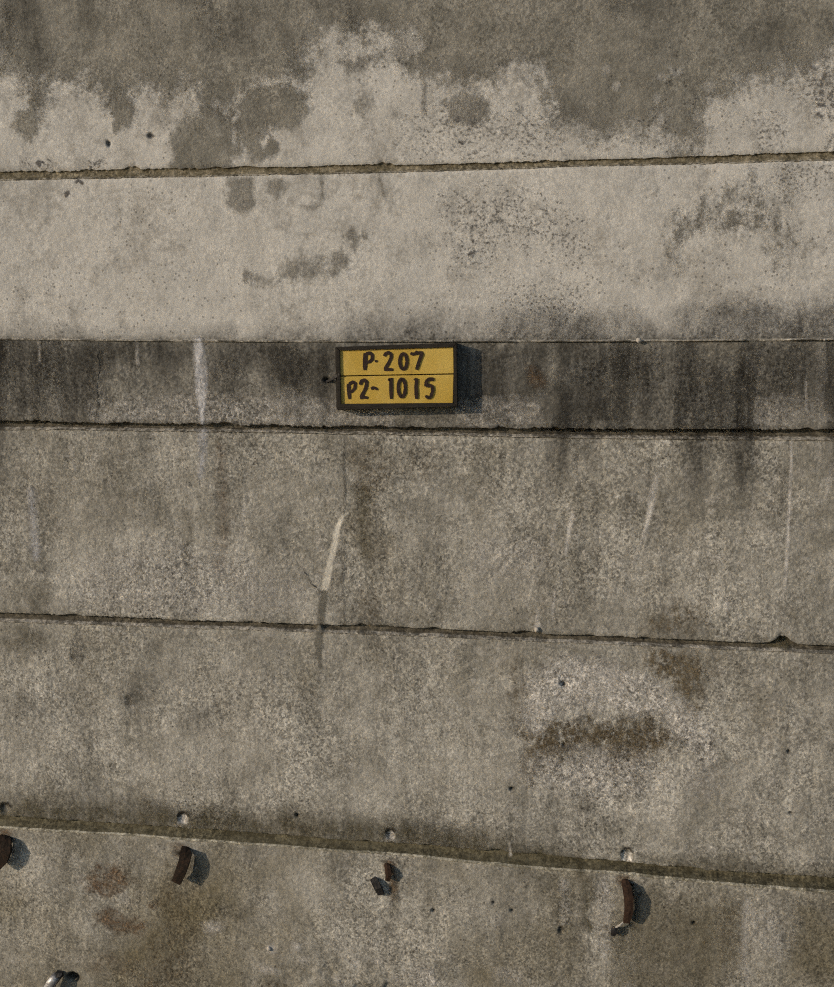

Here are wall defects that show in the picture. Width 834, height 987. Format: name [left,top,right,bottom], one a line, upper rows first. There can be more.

leakage [194,338,207,478]
crack [303,441,346,623]
leakage [521,713,684,783]